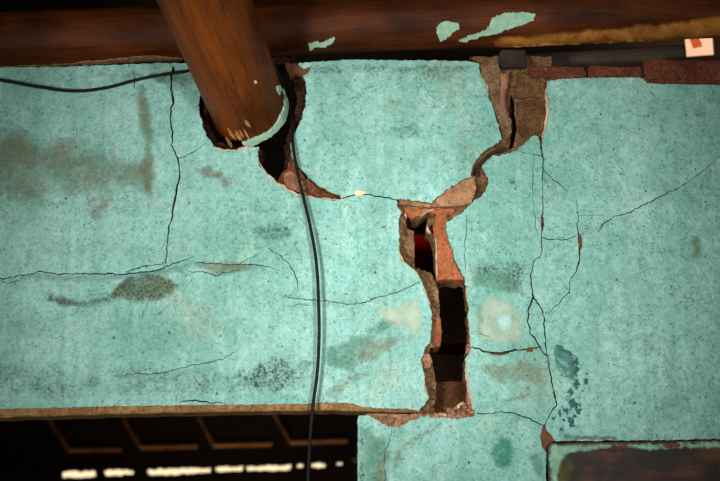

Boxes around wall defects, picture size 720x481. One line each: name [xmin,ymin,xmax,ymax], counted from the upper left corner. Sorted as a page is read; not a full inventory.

crack [0,66,423,307]
spalling [199,57,340,201]
spalling [366,56,552,428]
crack [471,146,713,426]
peeling [540,344,720,481]